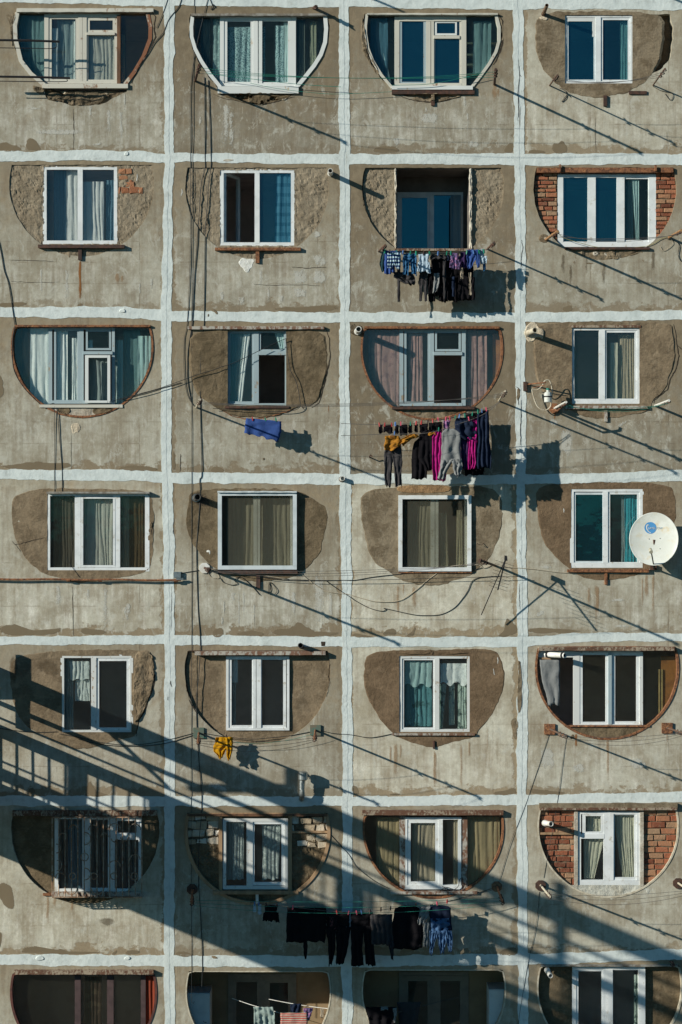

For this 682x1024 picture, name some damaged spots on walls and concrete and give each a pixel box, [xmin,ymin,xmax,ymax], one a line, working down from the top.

flaking render [119,168,143,194]